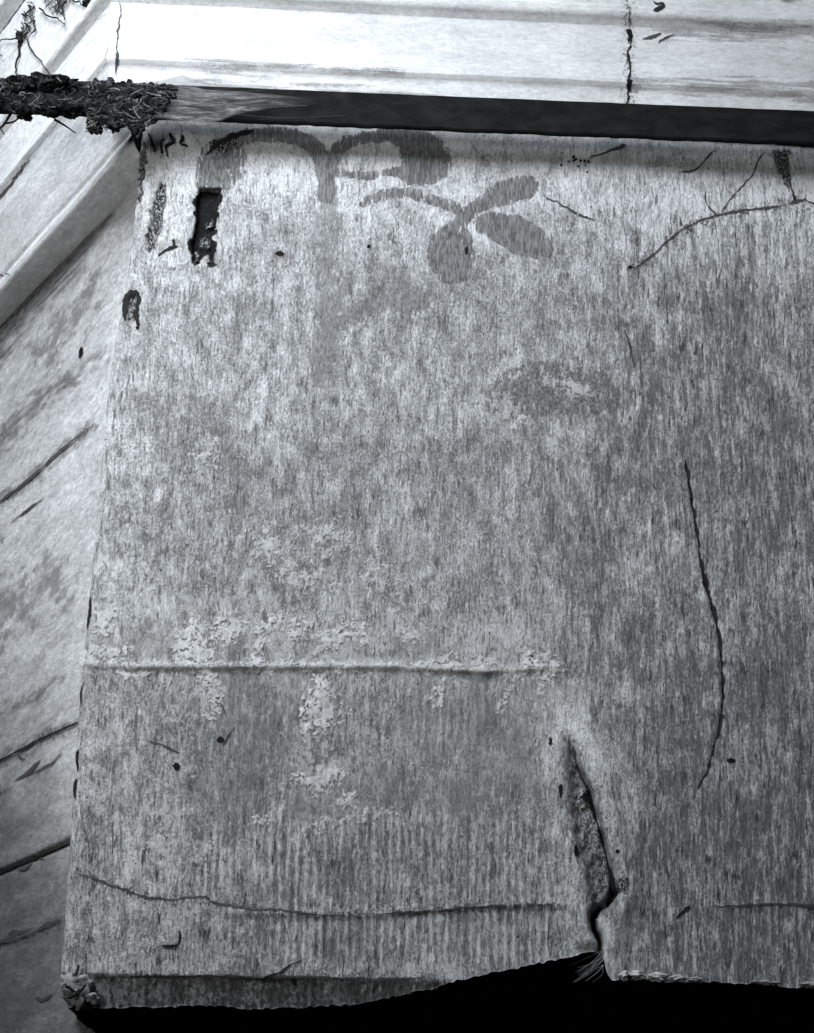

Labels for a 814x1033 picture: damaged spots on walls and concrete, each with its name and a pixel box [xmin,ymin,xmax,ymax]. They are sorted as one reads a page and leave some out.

crack [620,0,675,104]
spalling [187,190,223,267]
crack [627,148,814,277]
peeling [122,289,141,325]
crack [683,444,725,811]
crack [0,835,565,986]
crack [676,903,814,918]